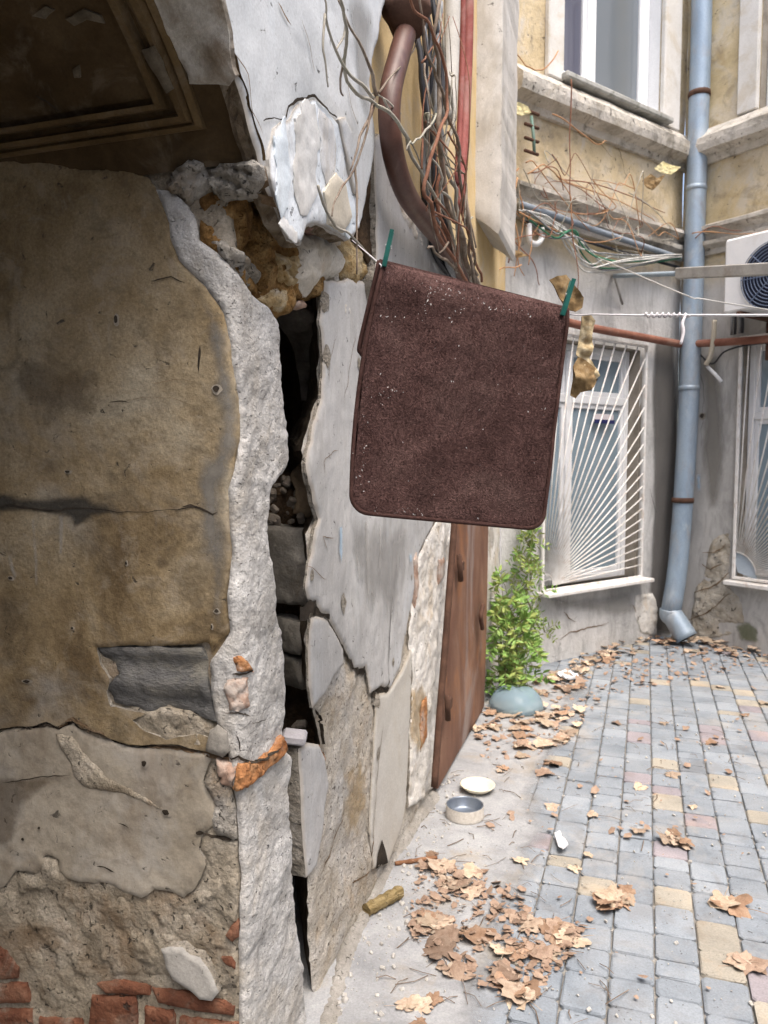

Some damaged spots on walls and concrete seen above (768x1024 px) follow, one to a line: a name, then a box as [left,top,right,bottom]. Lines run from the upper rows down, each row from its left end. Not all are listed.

crack [236,2,357,130]
crack [258,164,281,219]
flaking render [0,99,368,1024]
crack [0,319,412,878]
flaking render [689,533,744,639]